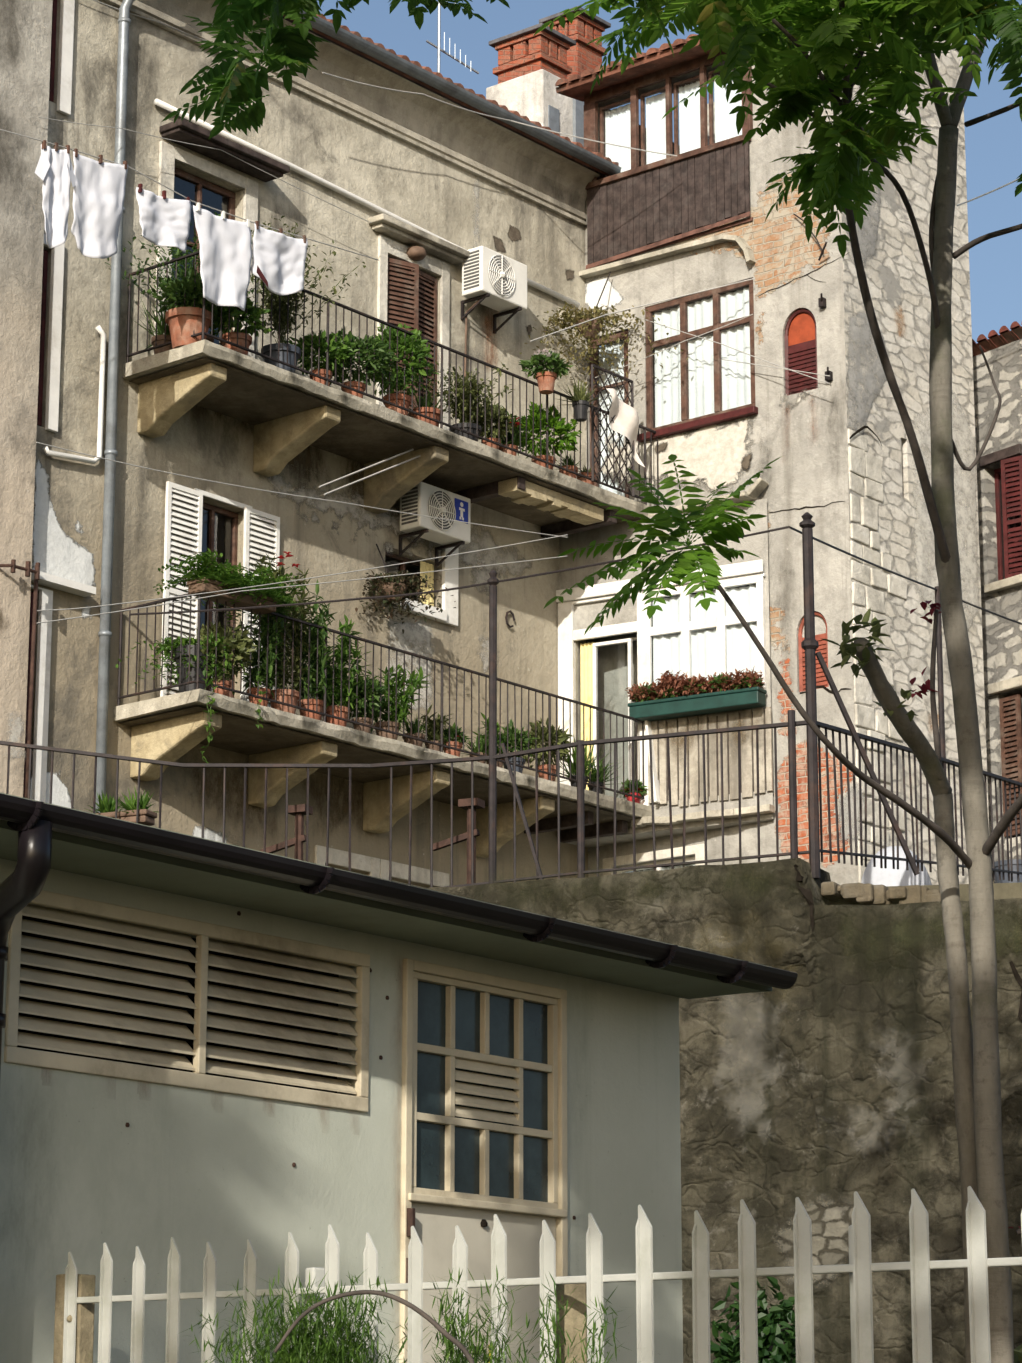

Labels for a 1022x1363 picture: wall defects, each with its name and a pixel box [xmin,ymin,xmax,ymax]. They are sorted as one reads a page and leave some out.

flaking render [675,165,881,349]
flaking render [769,607,853,868]
crack [1009,961,1022,1022]